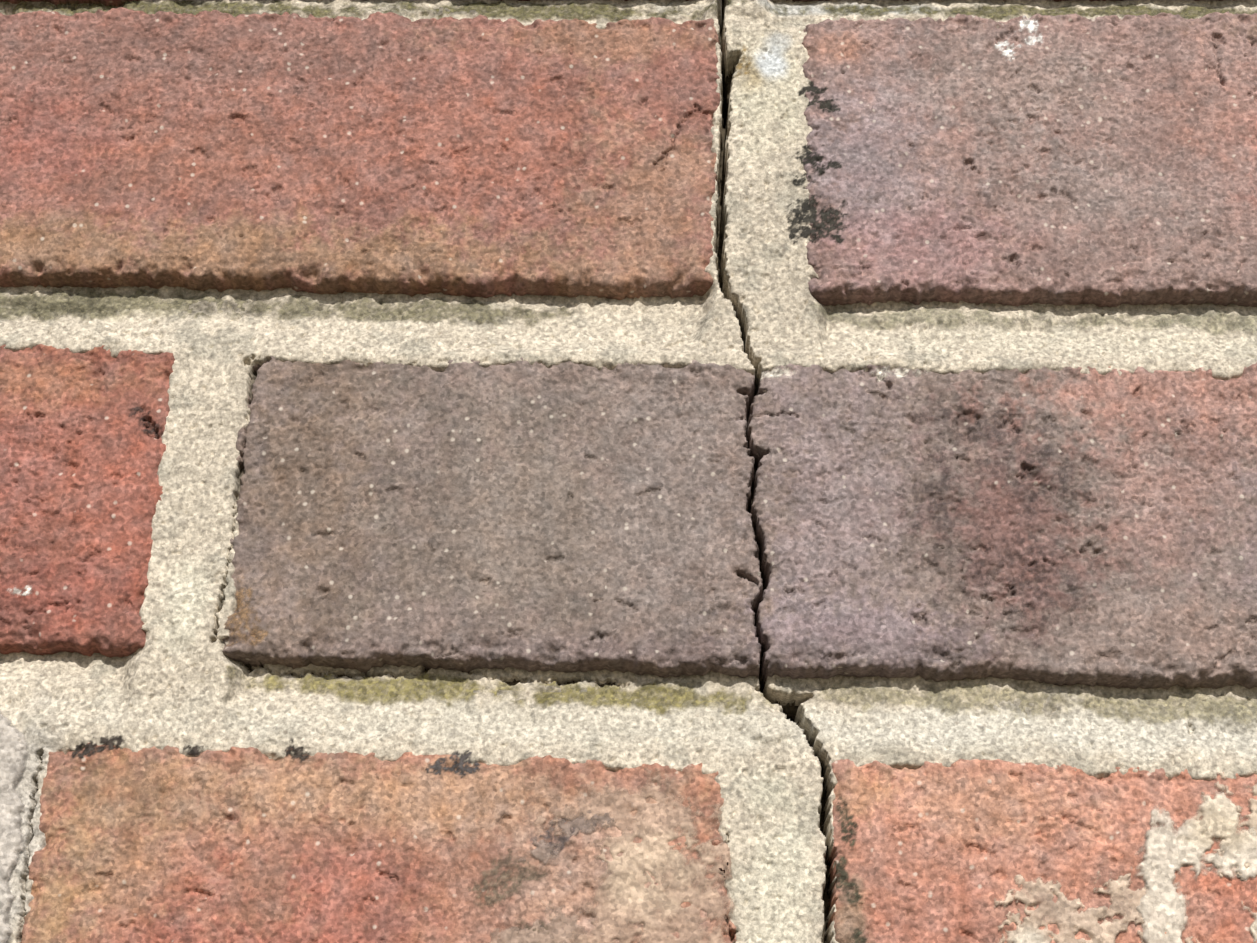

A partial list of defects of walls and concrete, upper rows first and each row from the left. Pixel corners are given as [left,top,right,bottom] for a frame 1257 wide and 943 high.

crack [655,0,735,295]
crack [740,322,799,513]
crack [738,548,832,943]
peeling [994,772,1257,943]